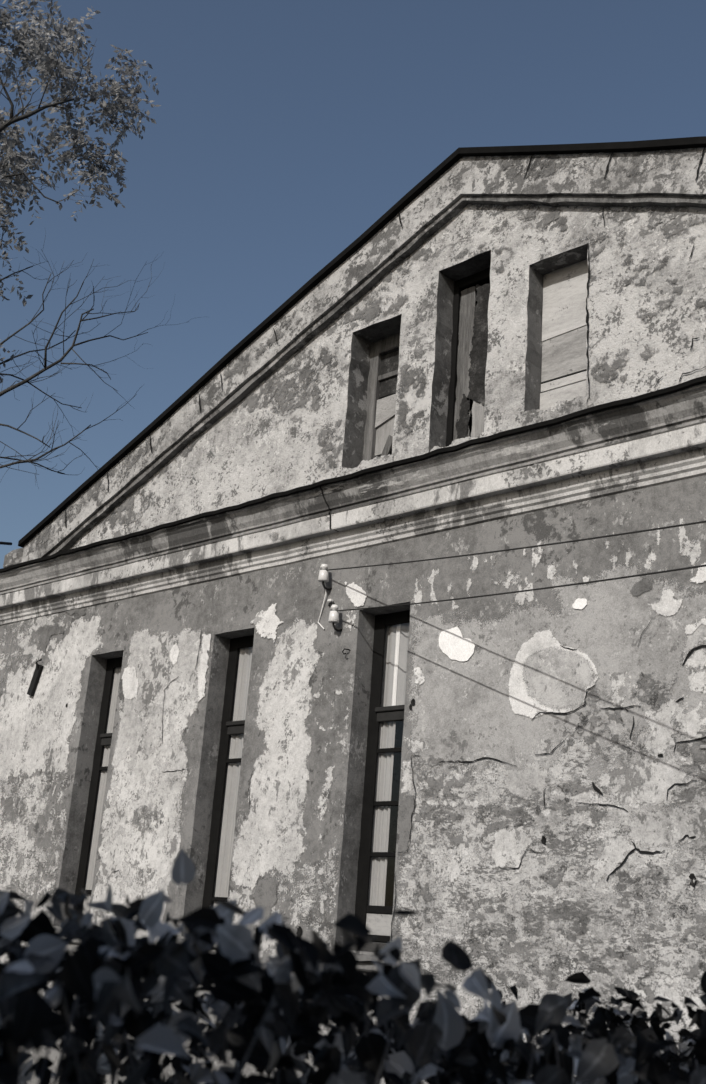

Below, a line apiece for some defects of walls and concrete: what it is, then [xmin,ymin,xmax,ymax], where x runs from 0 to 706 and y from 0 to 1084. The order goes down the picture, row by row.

peeling [466,541,556,605]
peeling [678,518,706,584]
peeling [345,582,366,631]
peeling [439,627,475,661]
peeling [0,616,104,897]
peeling [90,633,211,920]
peeling [229,603,349,958]
crack [579,782,628,812]
peeling [504,615,706,890]
crack [666,780,697,800]
crack [674,736,706,751]
crack [606,835,696,881]